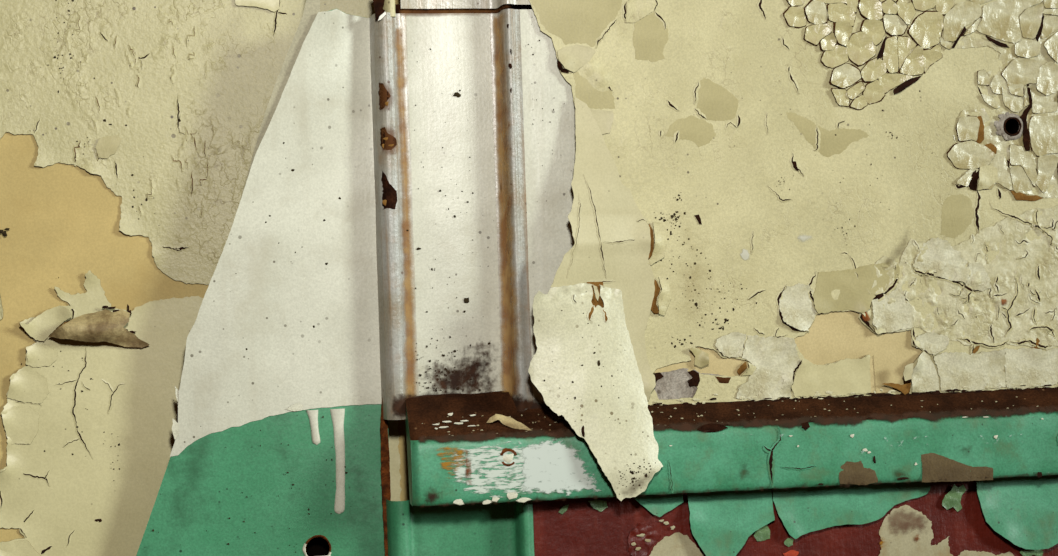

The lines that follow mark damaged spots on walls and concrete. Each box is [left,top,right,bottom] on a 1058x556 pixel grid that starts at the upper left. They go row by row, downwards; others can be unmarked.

peeling [320,0,375,18]
peeling [378,83,391,110]
rust [384,29,415,396]
crack [65,305,77,322]
peeling [0,0,306,556]
peeling [528,0,1058,556]
crack [841,150,1058,360]
crack [15,344,126,459]
crack [23,469,51,487]
peeling [388,420,402,501]
crack [0,491,75,555]